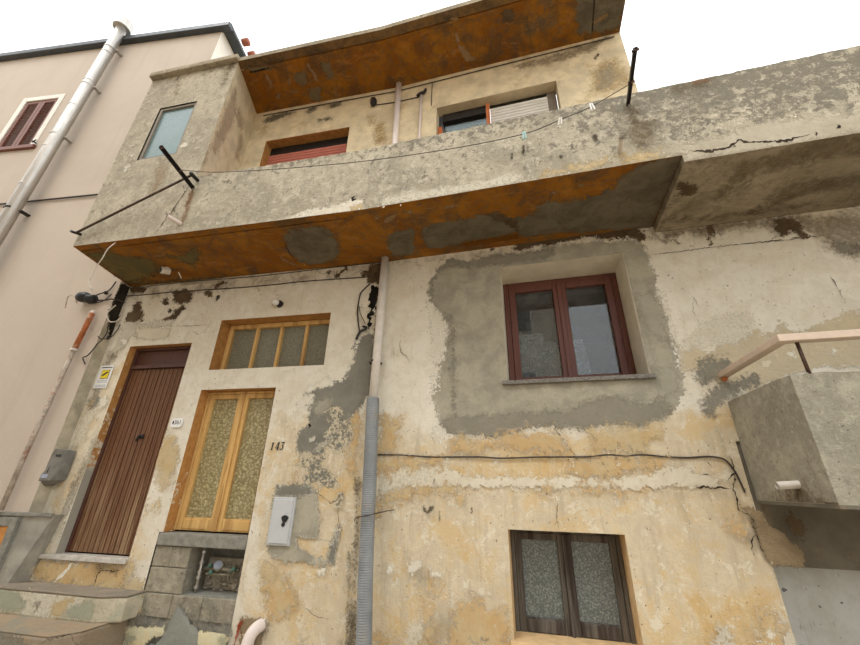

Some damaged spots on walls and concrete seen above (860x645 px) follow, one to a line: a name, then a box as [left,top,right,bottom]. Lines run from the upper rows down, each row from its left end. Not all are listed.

crack [691,132,818,153]
leakage [664,179,860,255]
leakage [511,229,653,251]
peeling [296,376,337,412]
crack [696,456,769,561]
peeling [416,566,512,645]
peeling [708,603,798,645]